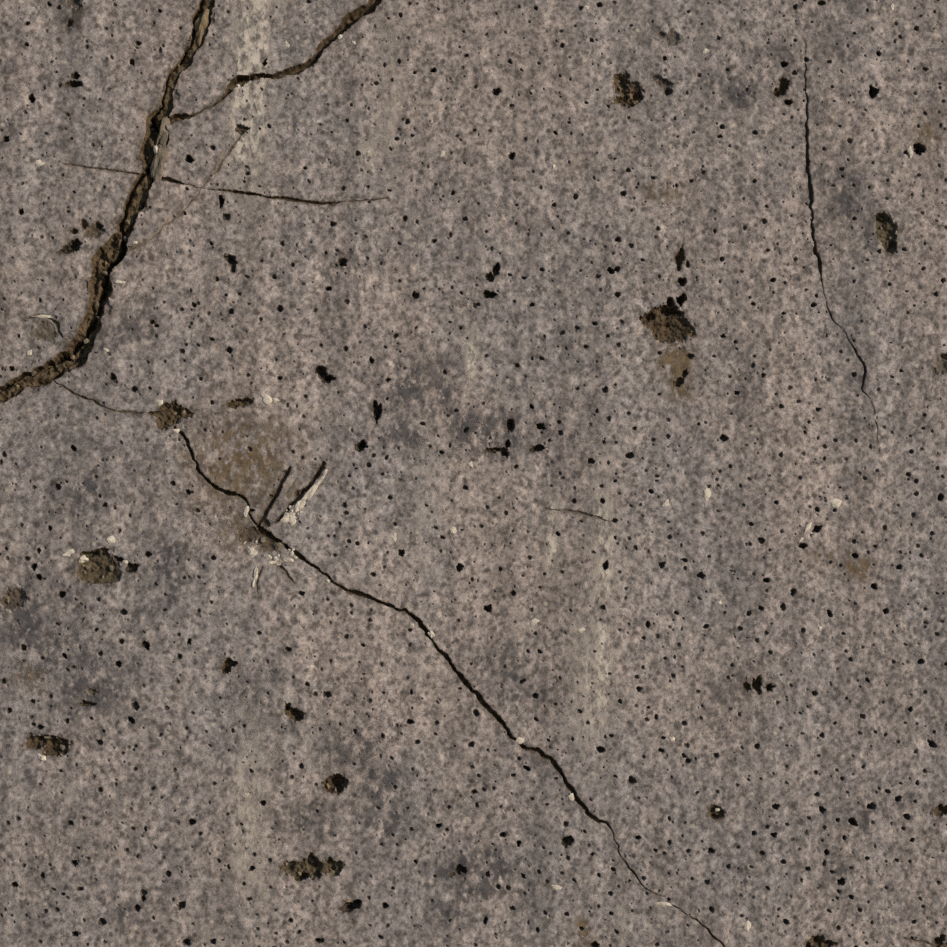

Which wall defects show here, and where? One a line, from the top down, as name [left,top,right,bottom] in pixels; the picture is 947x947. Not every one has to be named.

crack [800,37,883,456]
crack [0,0,733,947]
crack [899,933,947,947]